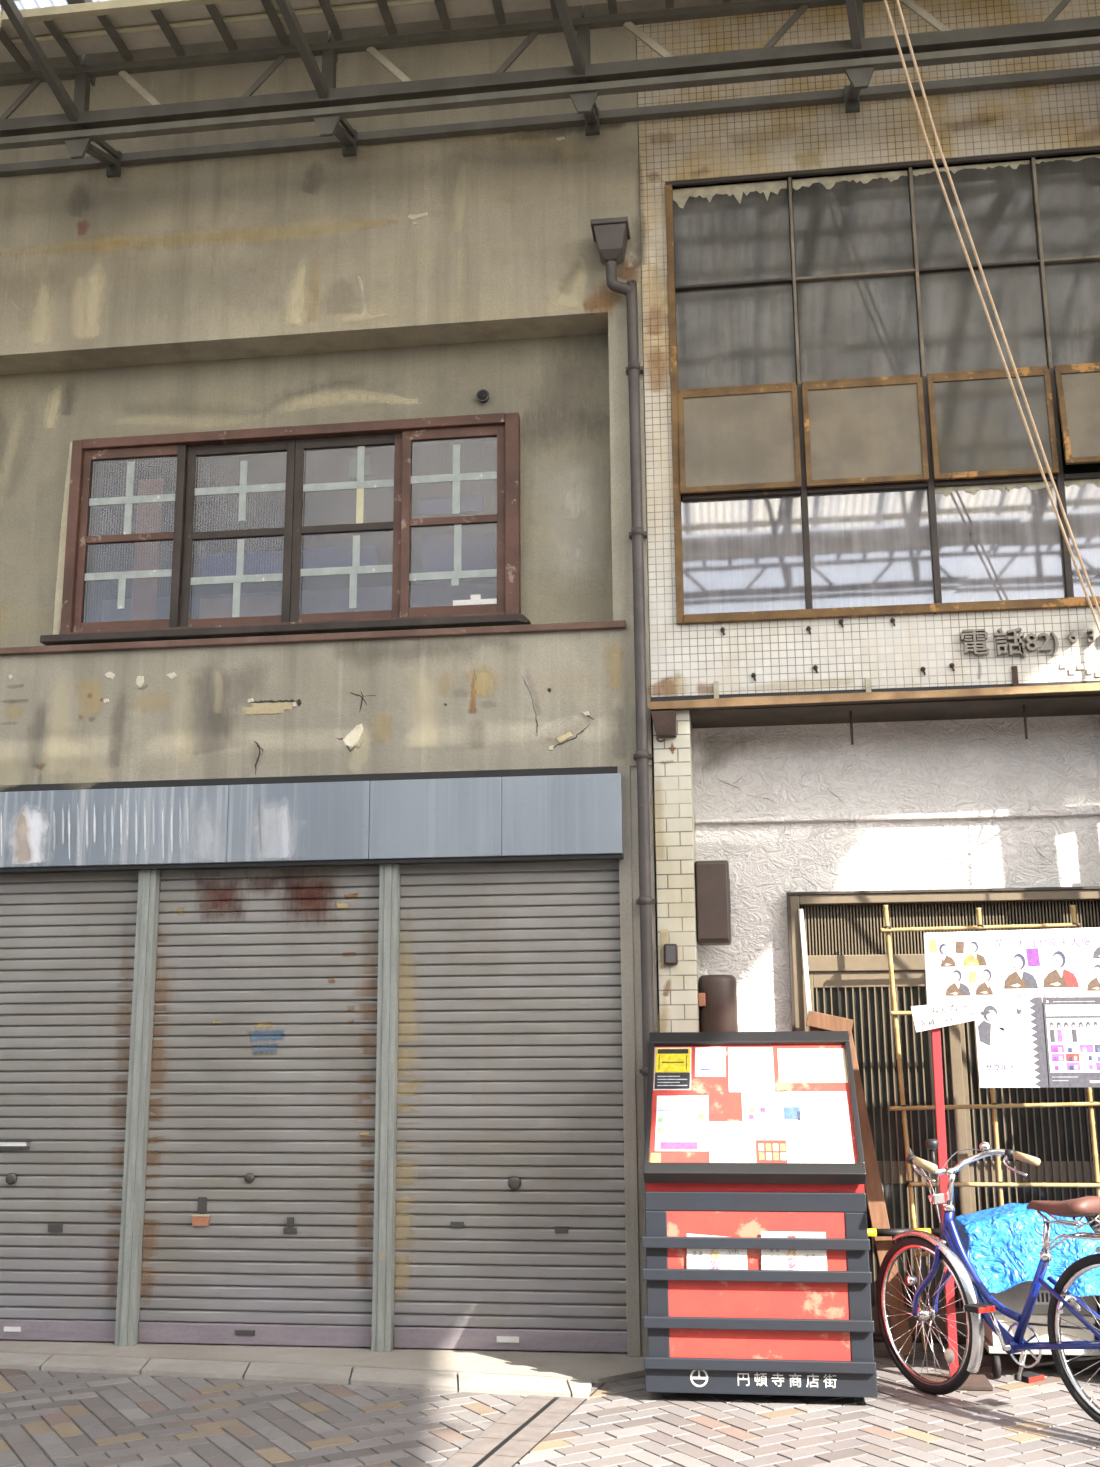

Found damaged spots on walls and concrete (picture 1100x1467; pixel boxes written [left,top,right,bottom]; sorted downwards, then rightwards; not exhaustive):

flaking render [337,723,363,752]
flaking render [549,711,594,750]
corrosion [204,882,239,916]
corrosion [286,877,357,918]